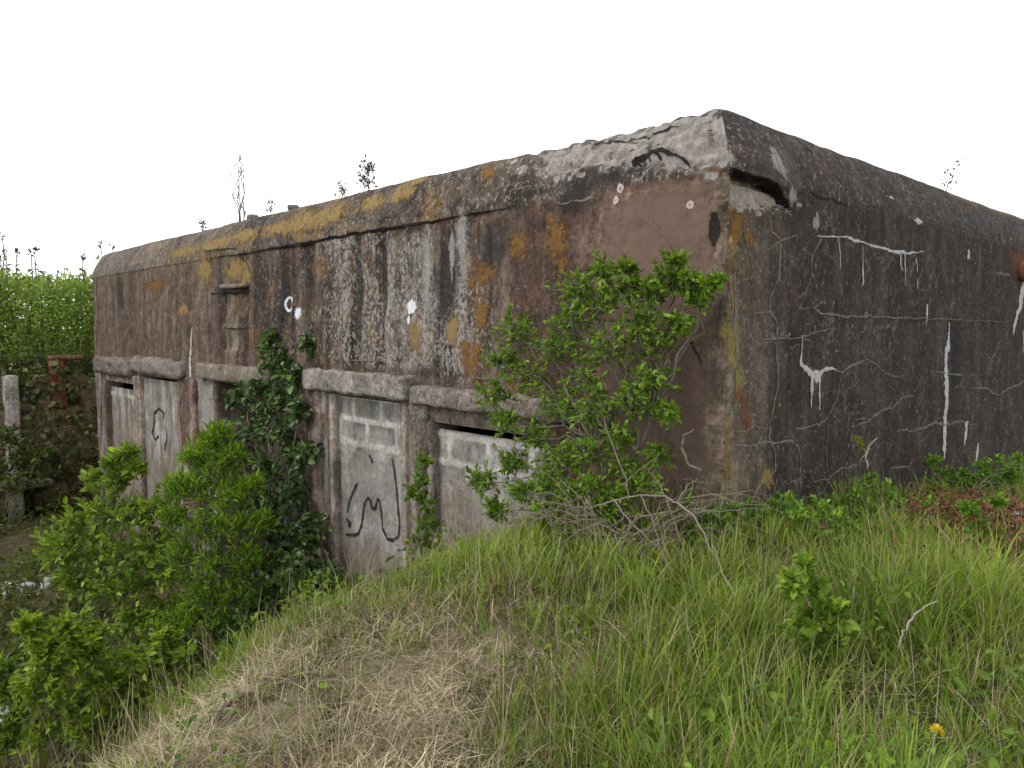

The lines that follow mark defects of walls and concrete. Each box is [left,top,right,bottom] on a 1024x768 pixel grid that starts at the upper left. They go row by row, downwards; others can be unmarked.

crack [595,126,690,168]
spalling [729,147,802,216]
leakage [423,204,468,313]
leakage [355,269,363,333]
crack [729,167,1024,499]